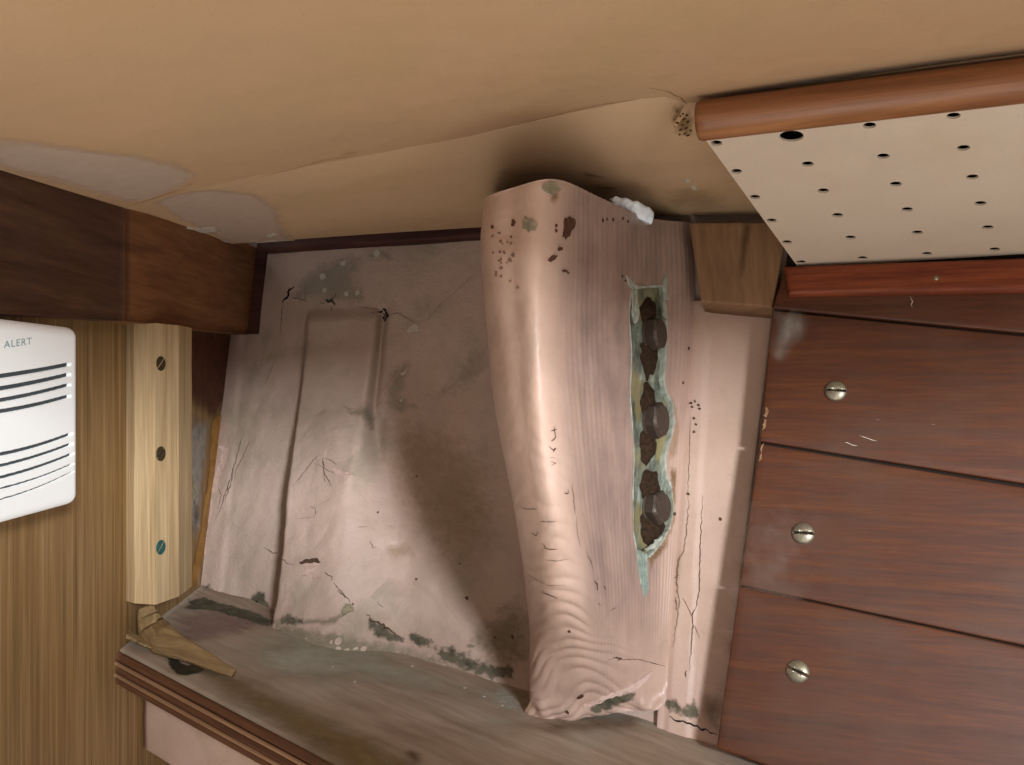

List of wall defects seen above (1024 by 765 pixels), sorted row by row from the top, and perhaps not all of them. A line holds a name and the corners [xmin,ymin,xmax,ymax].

crack [280,287,336,329]
corrosion [639,297,657,322]
corrosion [640,342,658,414]
crack [215,431,247,520]
peeling [626,273,675,588]
corrosion [639,431,676,499]
corrosion [640,513,666,563]
crack [610,417,703,676]
water stain [184,586,521,709]